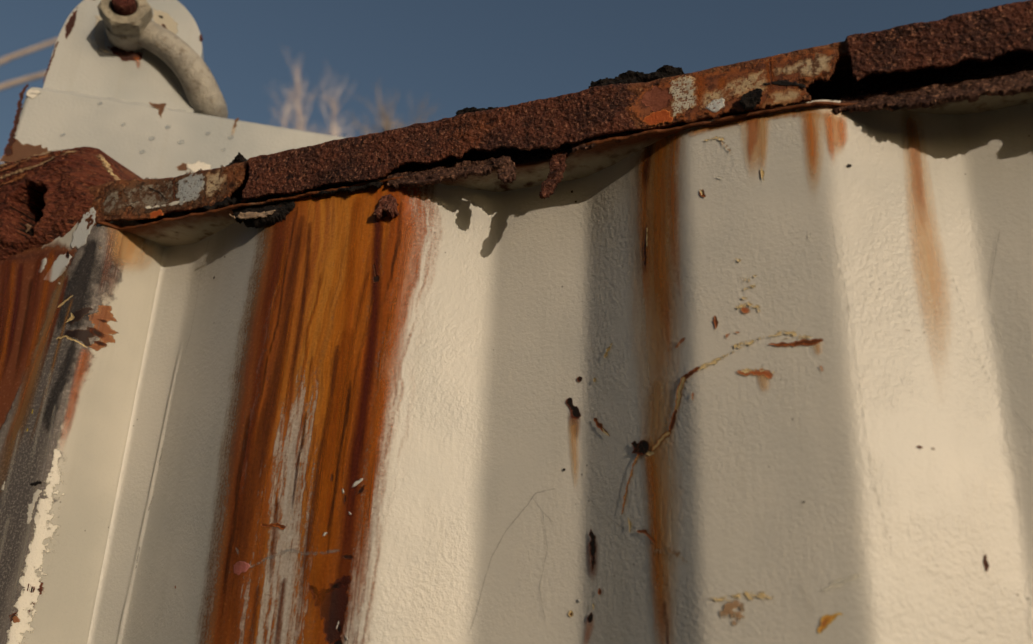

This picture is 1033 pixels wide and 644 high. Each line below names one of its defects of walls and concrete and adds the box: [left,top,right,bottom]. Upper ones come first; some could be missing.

corrosion [0,149,120,186]
peeling [40,161,230,284]
corrosion [225,152,247,167]
corrosion [455,107,498,116]
corrosion [539,131,631,199]
corrosion [588,65,684,88]
corrosion [693,70,1033,306]
corrosion [0,243,78,468]
corrosion [65,353,87,426]
corrosion [200,156,517,644]
crack [621,351,734,532]
peeling [6,449,66,644]